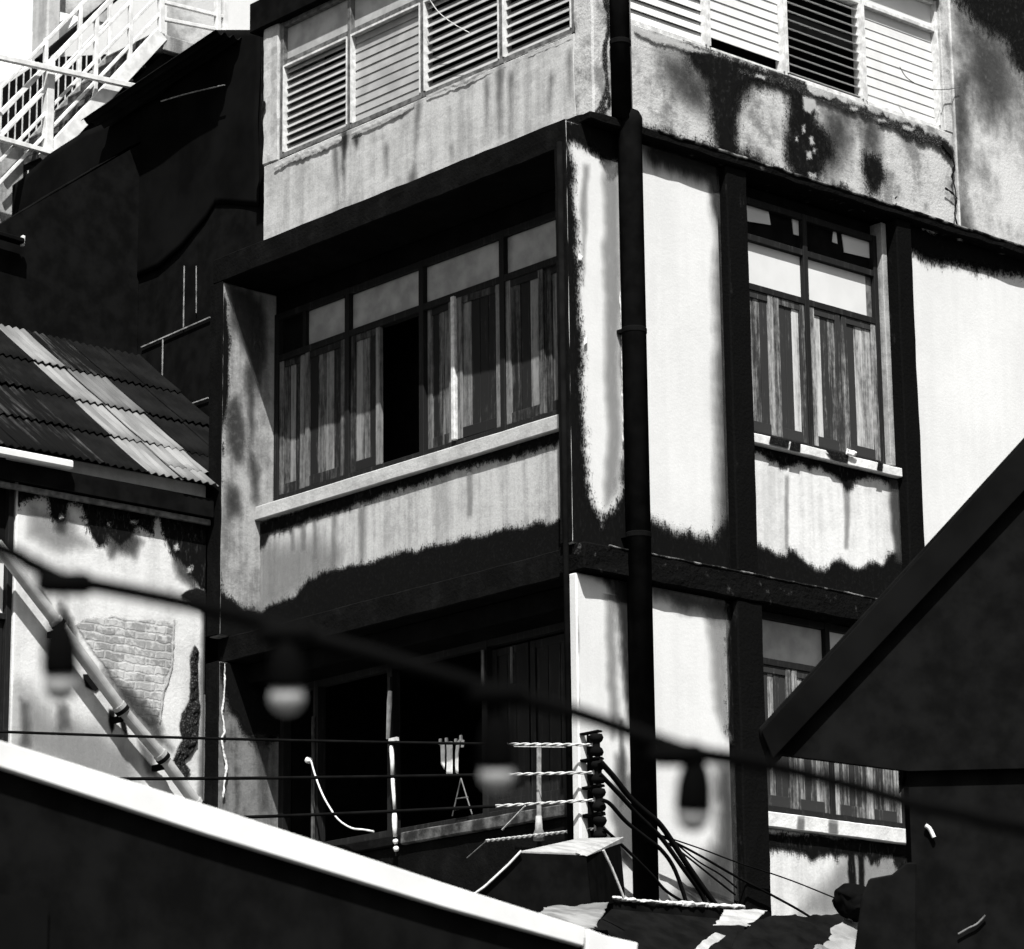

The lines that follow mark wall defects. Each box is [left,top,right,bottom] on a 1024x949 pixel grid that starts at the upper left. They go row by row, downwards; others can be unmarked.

leakage [643,40,889,200]
leakage [953,0,1024,171]
leakage [910,226,1024,282]
leakage [221,119,626,621]
leakage [18,483,206,591]
leakage [755,446,902,598]
spalling [83,674,98,692]